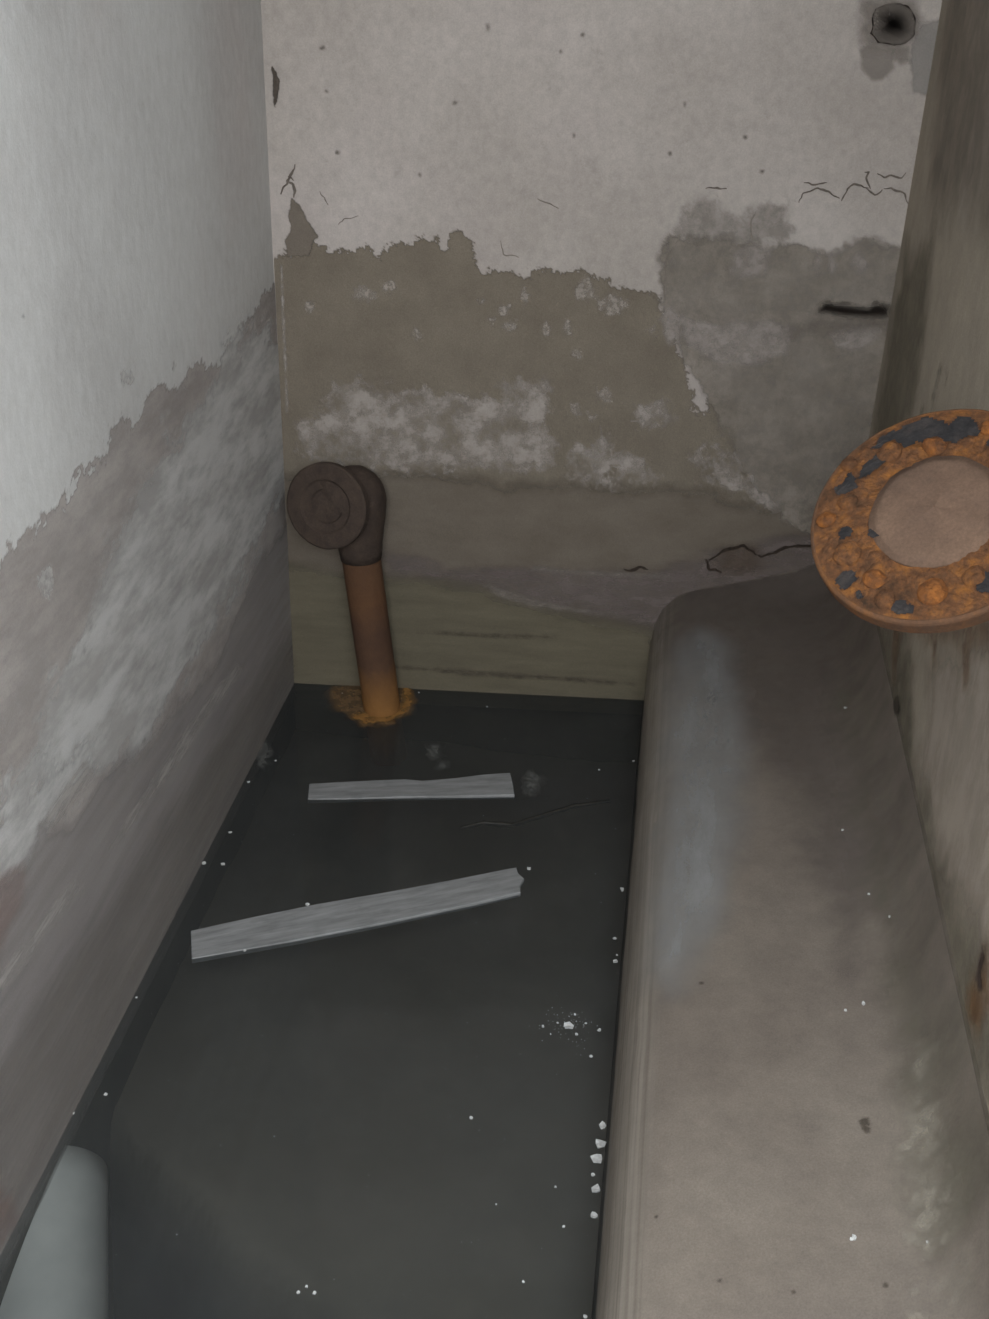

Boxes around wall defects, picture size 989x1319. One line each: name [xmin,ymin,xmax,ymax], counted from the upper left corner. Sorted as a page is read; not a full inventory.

spalling [864,1,917,47]
crack [798,171,909,204]
leakage [877,256,926,433]
peeling [0,204,989,889]
crack [624,565,648,573]
crack [705,544,811,573]
corrosion [814,410,989,620]
leakage [0,476,360,1268]
leakage [297,377,815,1318]
peeling [542,1013,601,1036]
peeling [590,1121,607,1193]